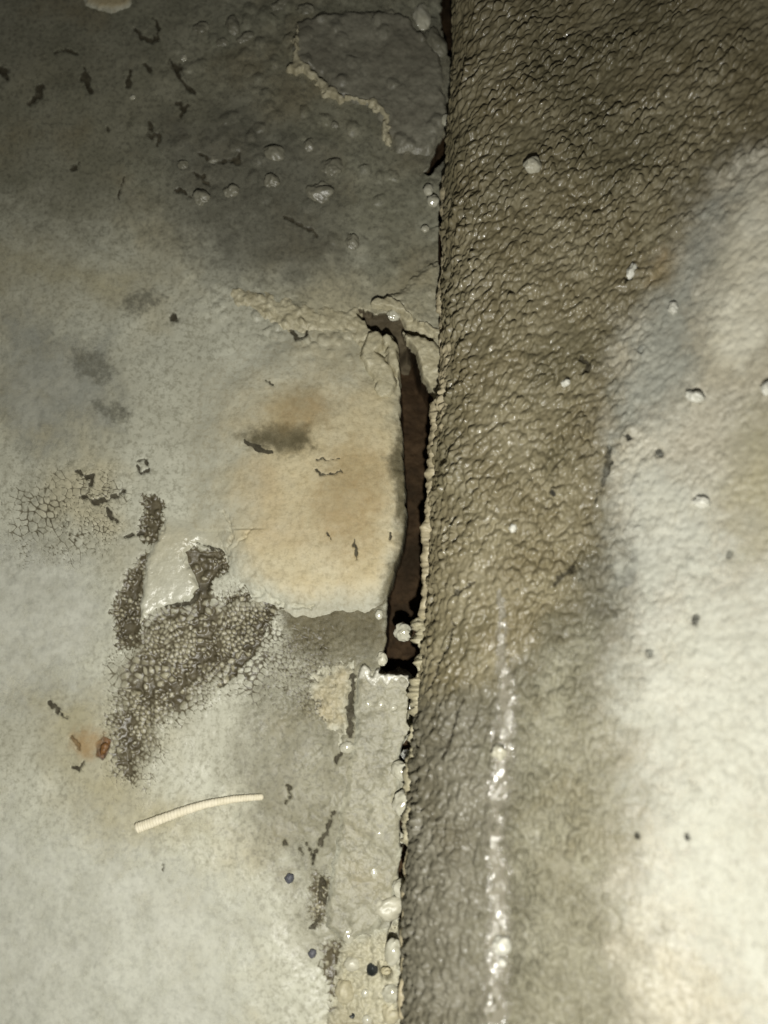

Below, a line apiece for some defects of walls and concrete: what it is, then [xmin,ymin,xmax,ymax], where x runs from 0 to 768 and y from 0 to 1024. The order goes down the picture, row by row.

damp [0,0,442,277]
crack [75,459,150,538]
crack [326,532,358,559]
damp [231,0,768,1024]
crack [166,592,200,607]
spalling [103,493,340,794]
rust [96,736,111,760]